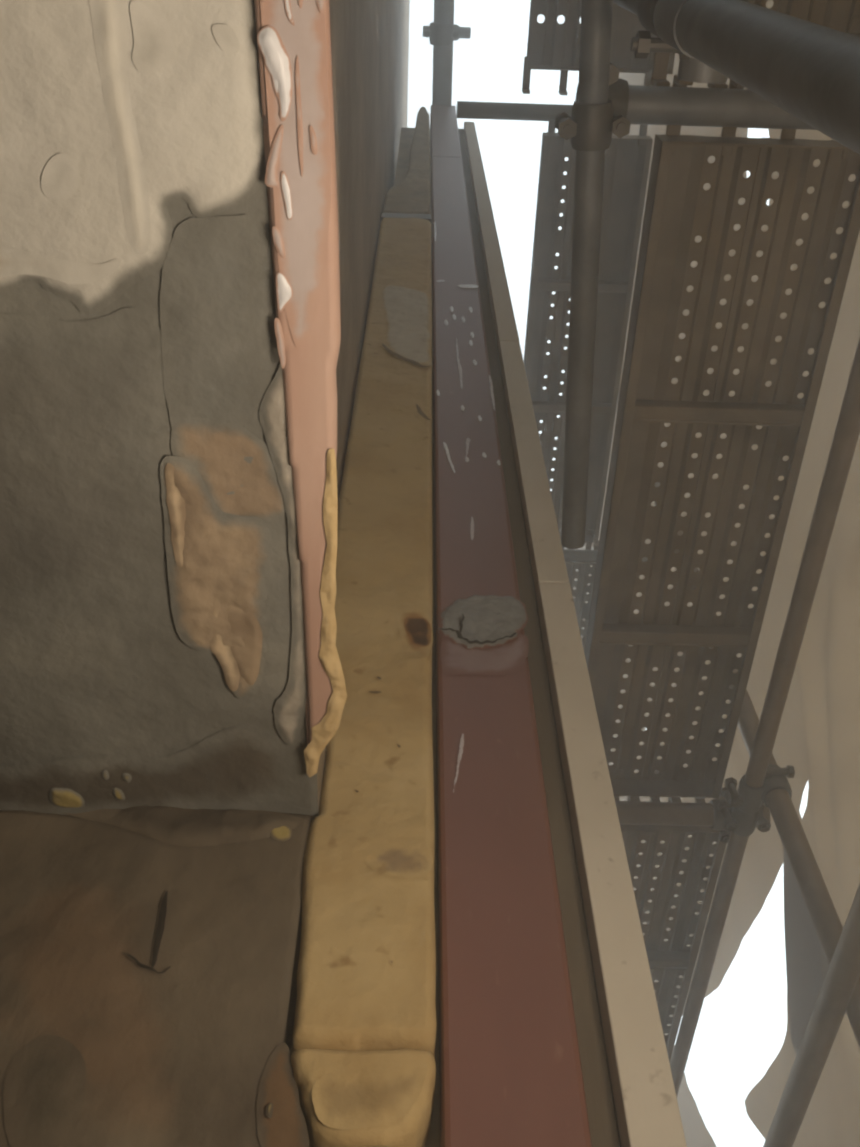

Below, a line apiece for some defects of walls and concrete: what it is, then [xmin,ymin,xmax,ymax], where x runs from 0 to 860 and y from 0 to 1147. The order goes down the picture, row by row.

peeling [0,0,331,369]
spalling [160,417,286,699]
crack [123,890,171,975]